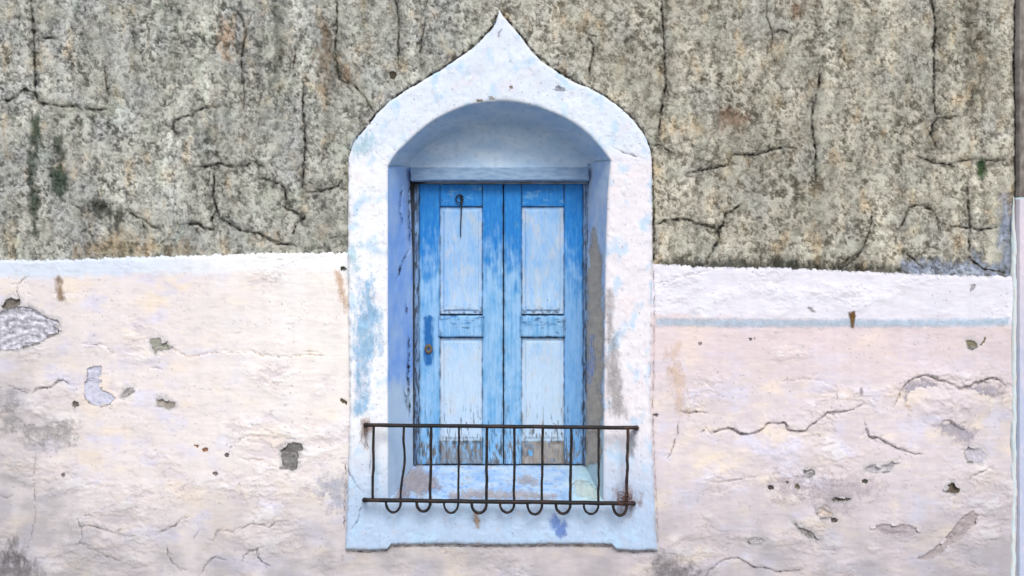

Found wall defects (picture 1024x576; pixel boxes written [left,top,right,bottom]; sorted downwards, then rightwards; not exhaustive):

crack [5,0,108,111]
damp [27,152,38,235]
damp [50,137,68,197]
crack [188,53,342,246]
crack [693,75,821,181]
crack [901,188,1002,273]
crack [921,0,1016,195]
spalling [0,295,62,350]
peeling [72,365,135,407]
spalling [149,338,173,353]
spalling [279,442,303,471]
peeling [768,459,901,522]